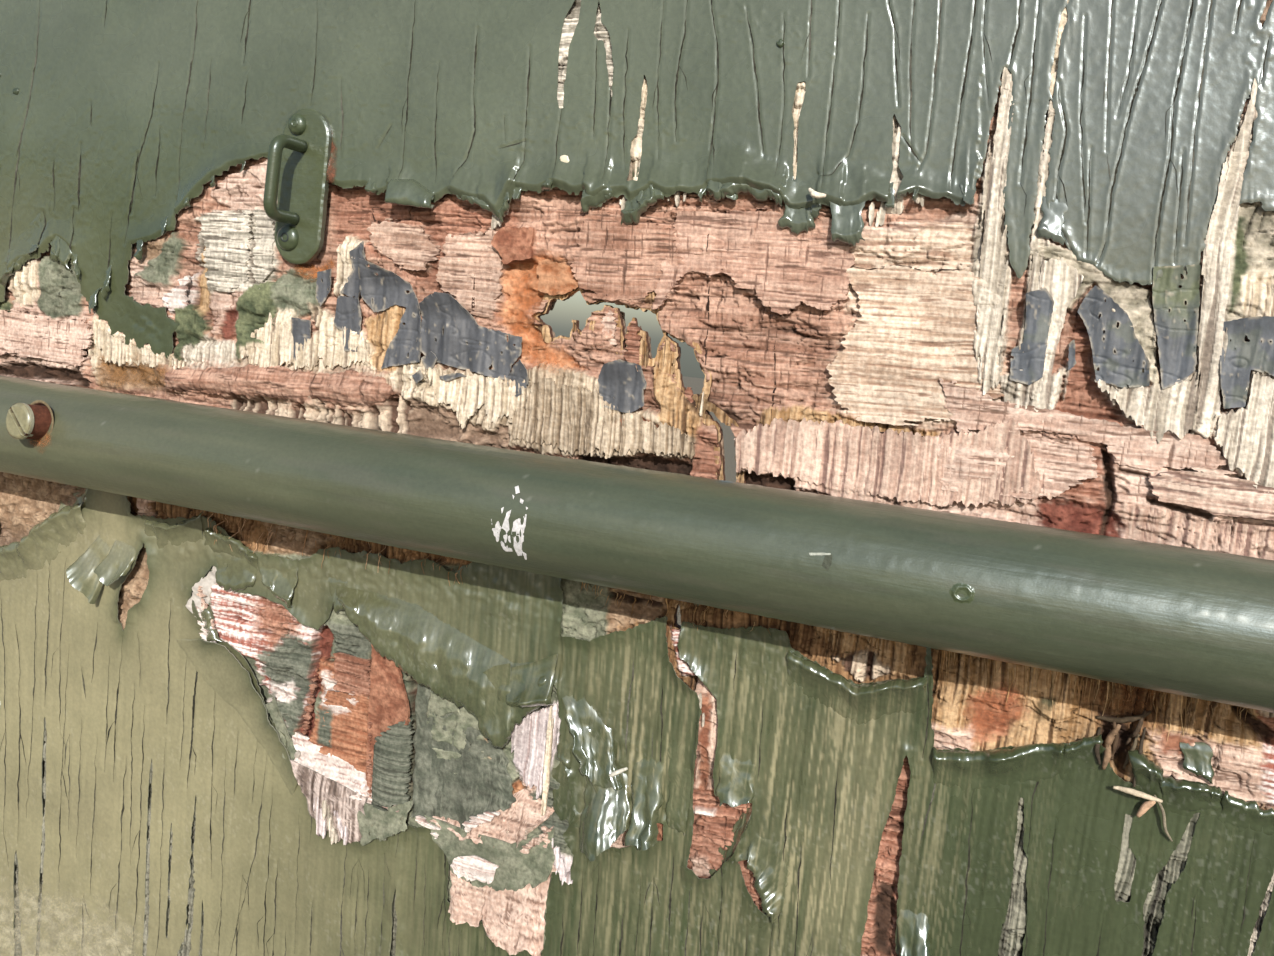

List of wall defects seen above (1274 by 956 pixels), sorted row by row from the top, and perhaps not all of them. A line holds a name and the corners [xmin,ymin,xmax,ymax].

crack [380,5,530,180]
crack [593,0,719,178]
crack [747,0,1242,259]
peeling [0,67,1274,560]
crack [0,563,486,956]
peeling [0,472,691,956]
peeling [560,579,1274,835]
crack [560,766,839,956]
peeling [896,909,933,956]
crack [960,781,1055,956]
crack [1097,813,1200,956]
crack [1241,837,1274,956]